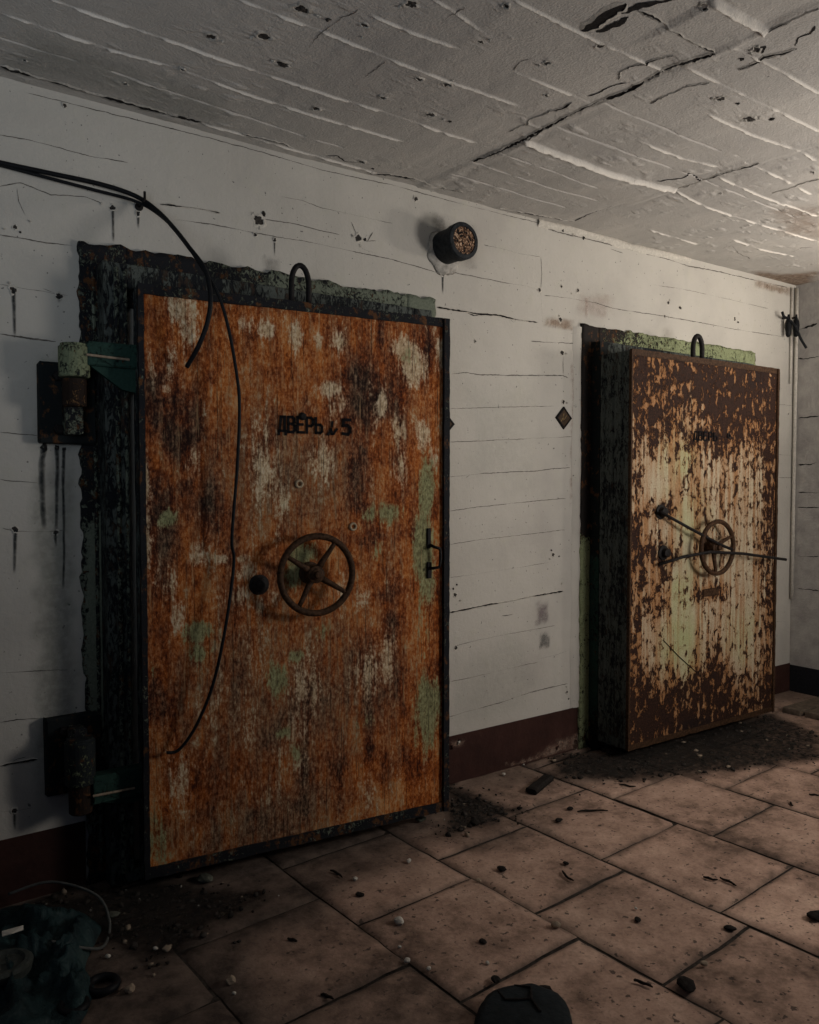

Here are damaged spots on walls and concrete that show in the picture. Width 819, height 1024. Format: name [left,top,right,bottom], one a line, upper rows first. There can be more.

crack [738,8,819,70]
crack [473,0,715,163]
crack [0,65,794,308]
crack [773,179,819,193]
crack [454,371,568,379]
crack [452,467,570,477]
damp [40,444,66,581]
crack [450,590,562,646]